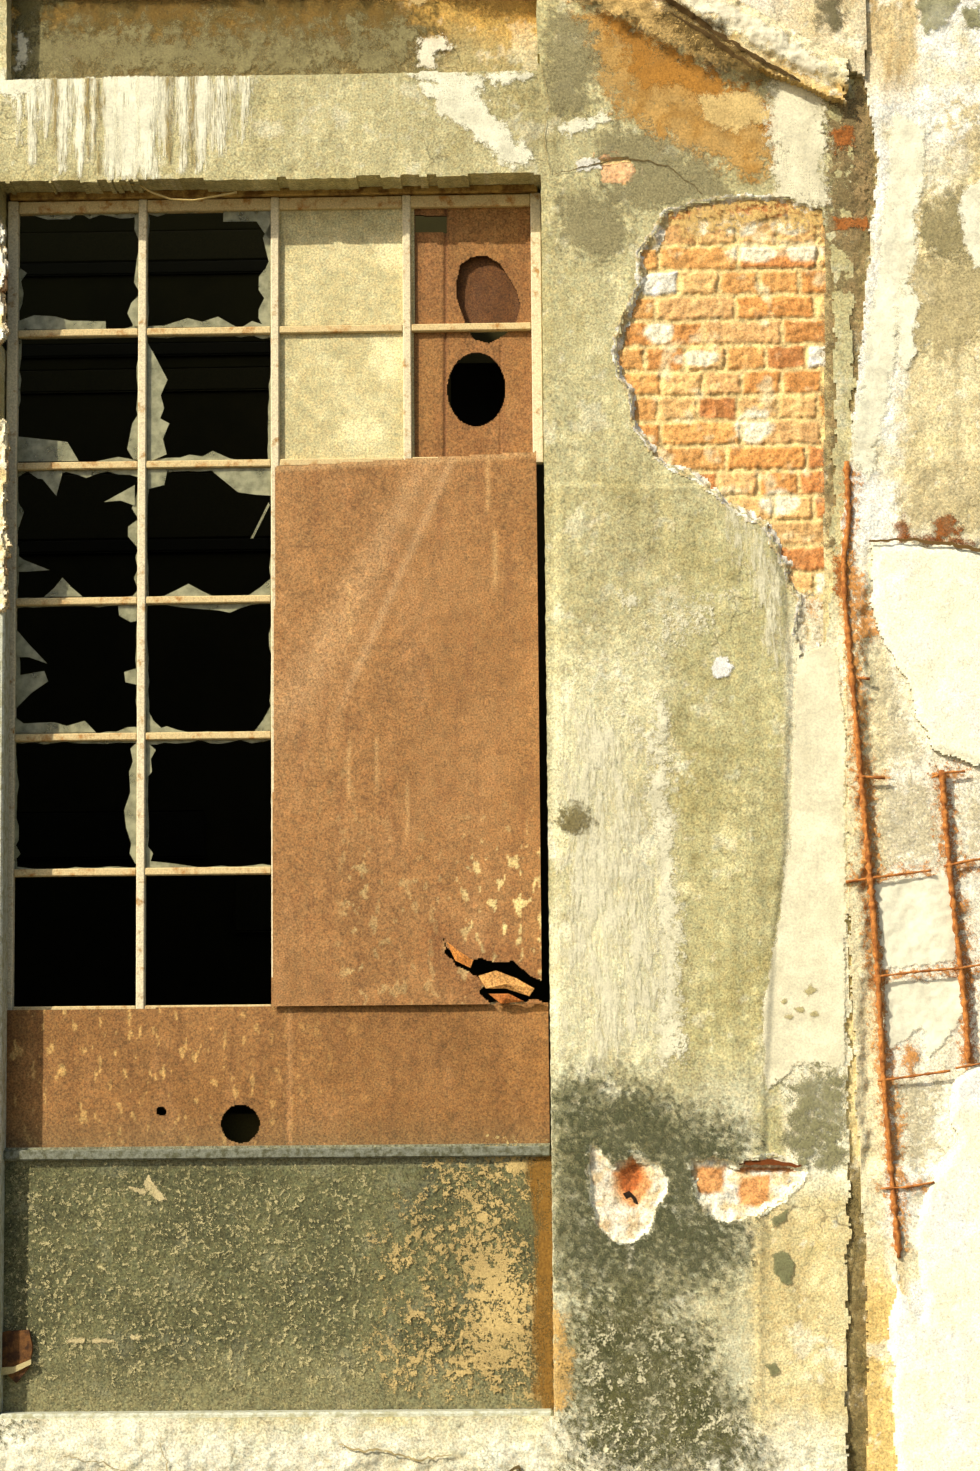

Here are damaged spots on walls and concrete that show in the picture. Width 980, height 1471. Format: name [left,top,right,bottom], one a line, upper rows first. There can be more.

flaking render [0,220,10,346]
water stain [0,0,447,180]
water stain [467,0,980,558]
rust [827,123,856,155]
rust [832,216,869,231]
flaking render [0,418,13,613]
water stain [617,587,733,663]
water stain [727,507,790,666]
flaking render [611,192,980,1471]
rust [832,466,980,1254]
water stain [551,689,869,1471]
flaking render [584,1144,670,1273]